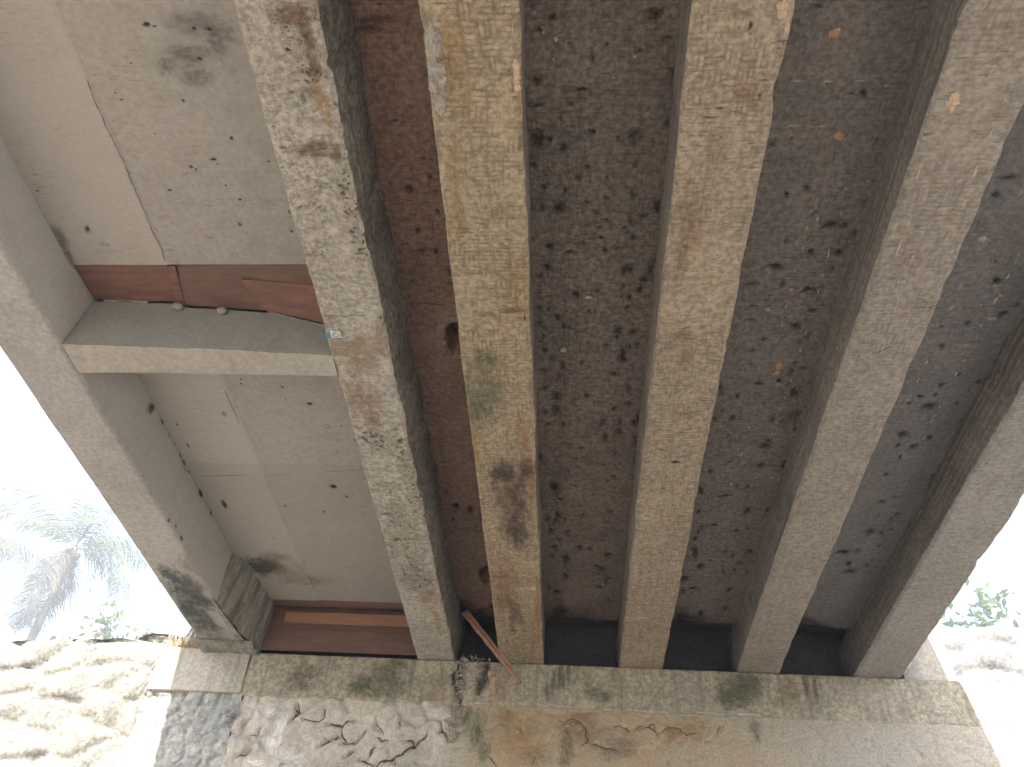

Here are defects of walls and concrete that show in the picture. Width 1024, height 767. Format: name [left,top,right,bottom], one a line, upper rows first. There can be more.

water stain [492,464,534,547]
water stain [250,558,282,575]
water stain [160,569,219,636]
crack [292,664,462,767]
crack [560,718,720,751]